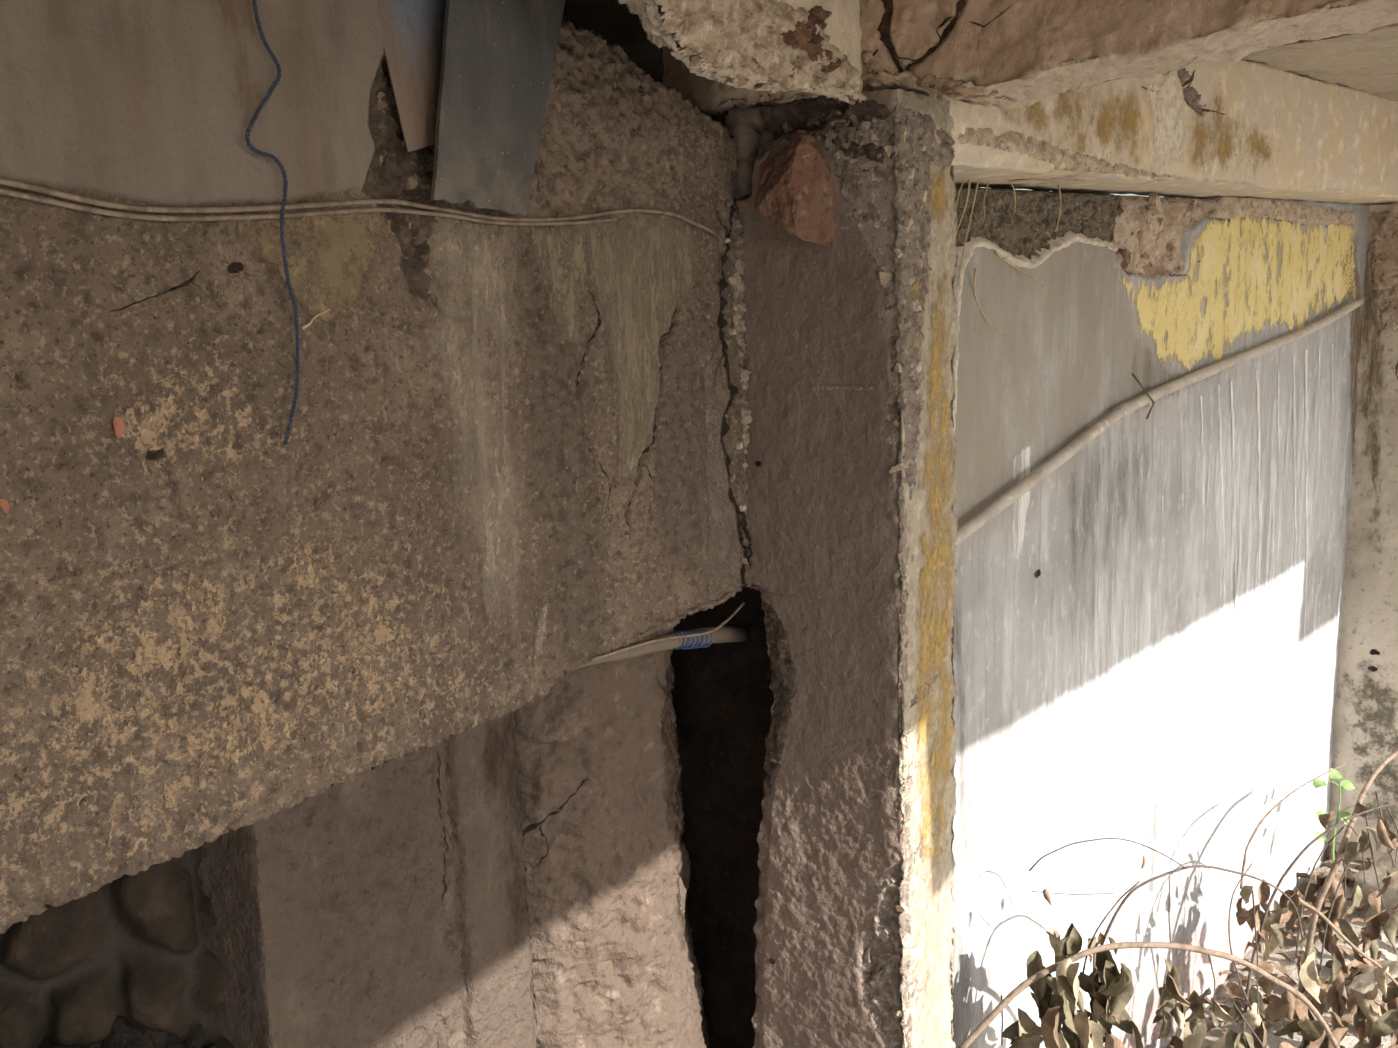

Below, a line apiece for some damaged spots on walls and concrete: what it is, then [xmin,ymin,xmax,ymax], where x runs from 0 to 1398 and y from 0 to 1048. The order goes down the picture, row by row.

water stain [1027,92,1139,154]
crack [1141,56,1225,115]
water stain [1194,98,1235,165]
crack [575,283,677,527]
crack [712,197,753,586]
spalling [653,0,1398,1048]
water stain [916,275,954,1048]
crack [523,779,590,872]